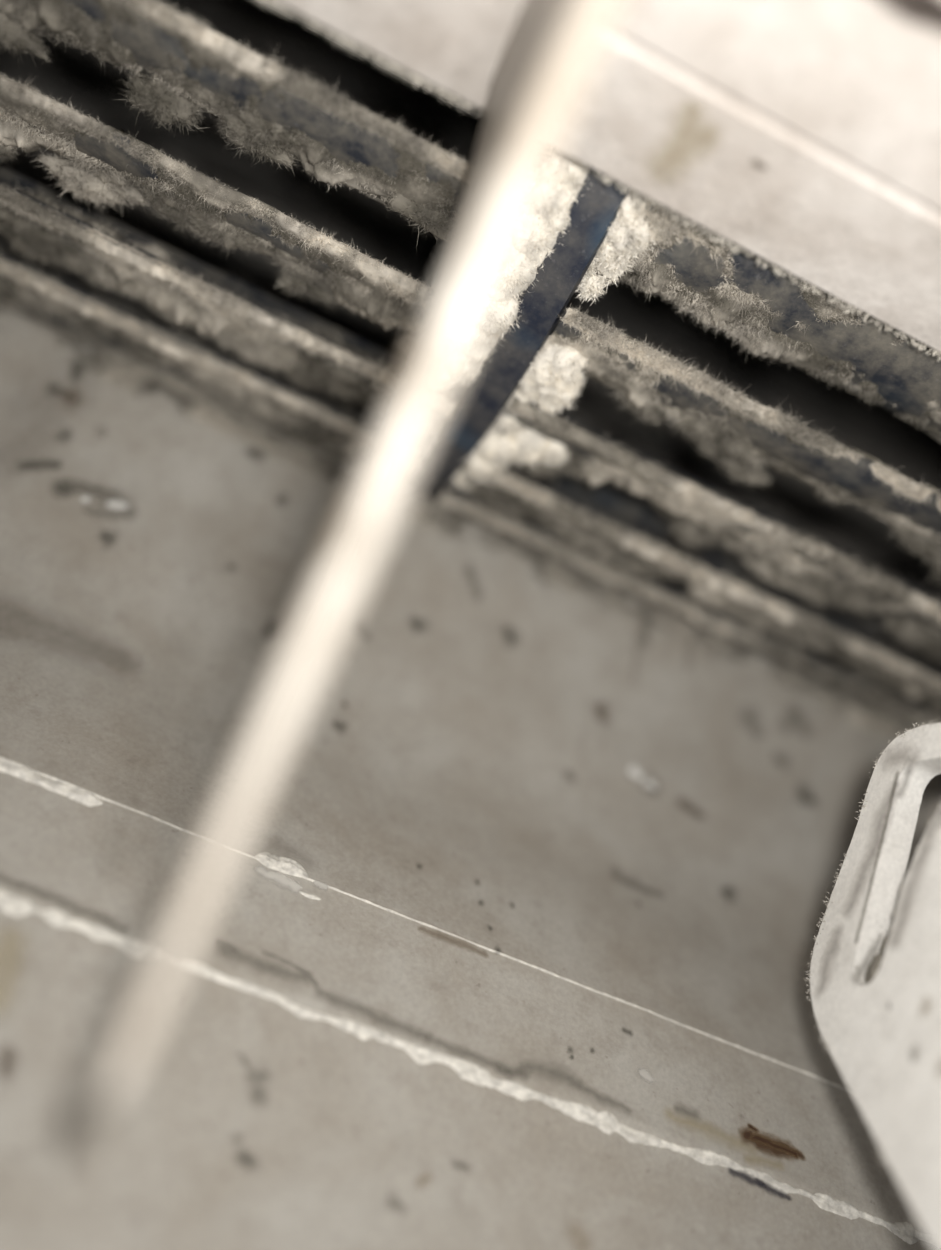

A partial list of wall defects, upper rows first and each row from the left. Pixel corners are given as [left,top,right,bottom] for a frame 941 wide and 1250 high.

peeling [107,501,128,509]
rust [741,1124,805,1160]